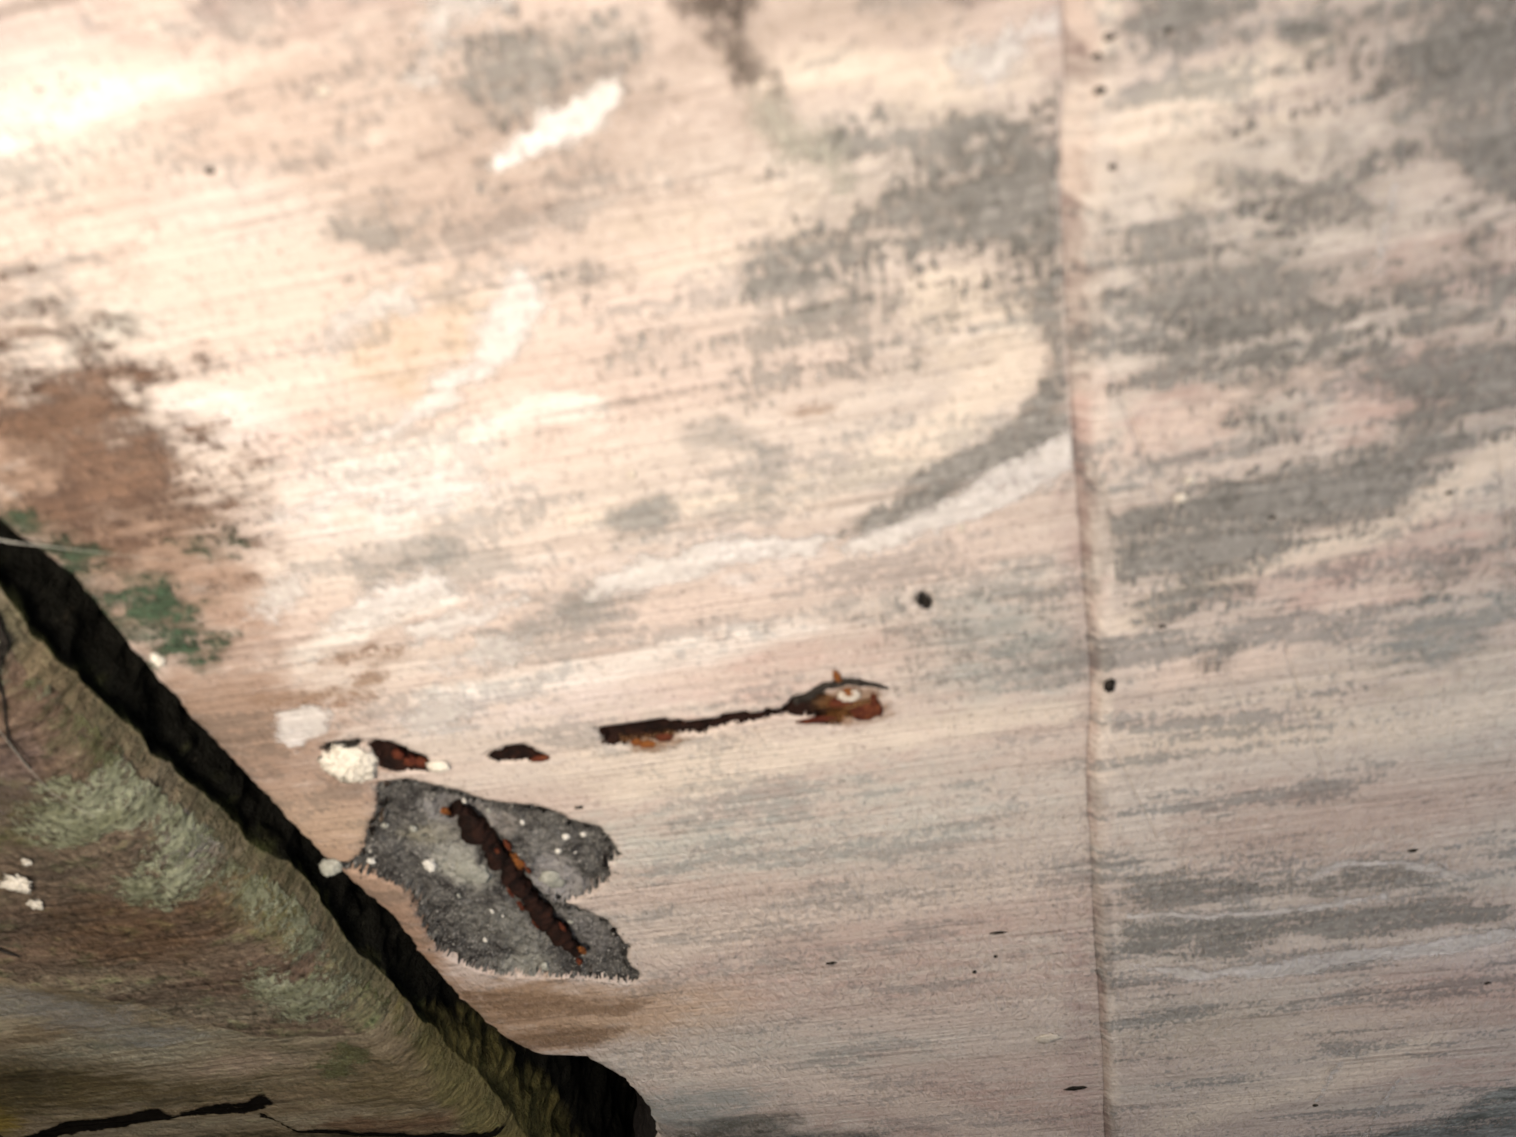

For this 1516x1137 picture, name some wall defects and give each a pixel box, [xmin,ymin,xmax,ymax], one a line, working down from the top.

damp [330,281,417,347]
damp [0,298,491,573]
corrosion [368,739,431,772]
corrosion [486,743,551,762]
spalling [342,778,639,985]
crack [26,1095,505,1137]